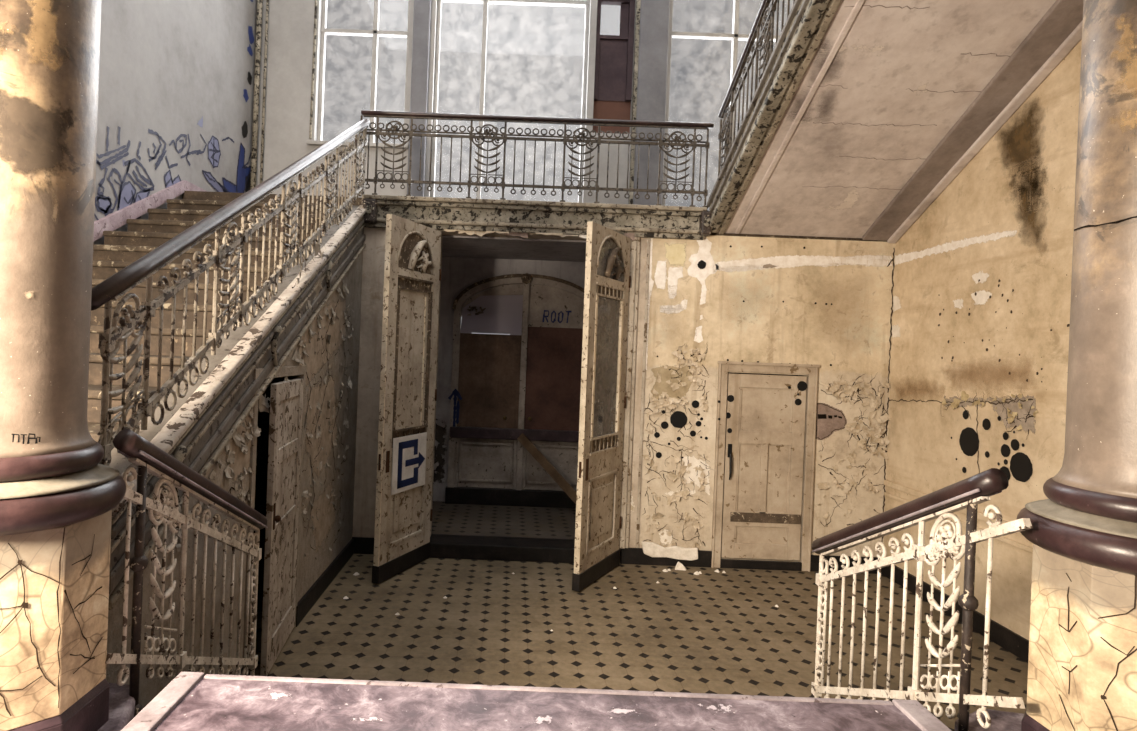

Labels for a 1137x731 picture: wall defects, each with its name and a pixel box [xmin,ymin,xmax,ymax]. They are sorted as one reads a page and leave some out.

leakage [0,89,73,175]
leakage [1000,103,1044,243]
crack [1074,216,1137,231]
peeling [209,394,270,503]
flaking render [284,241,355,560]
flaking render [627,344,713,548]
flaking render [813,374,891,555]
crack [0,527,103,716]
crack [1059,573,1137,731]